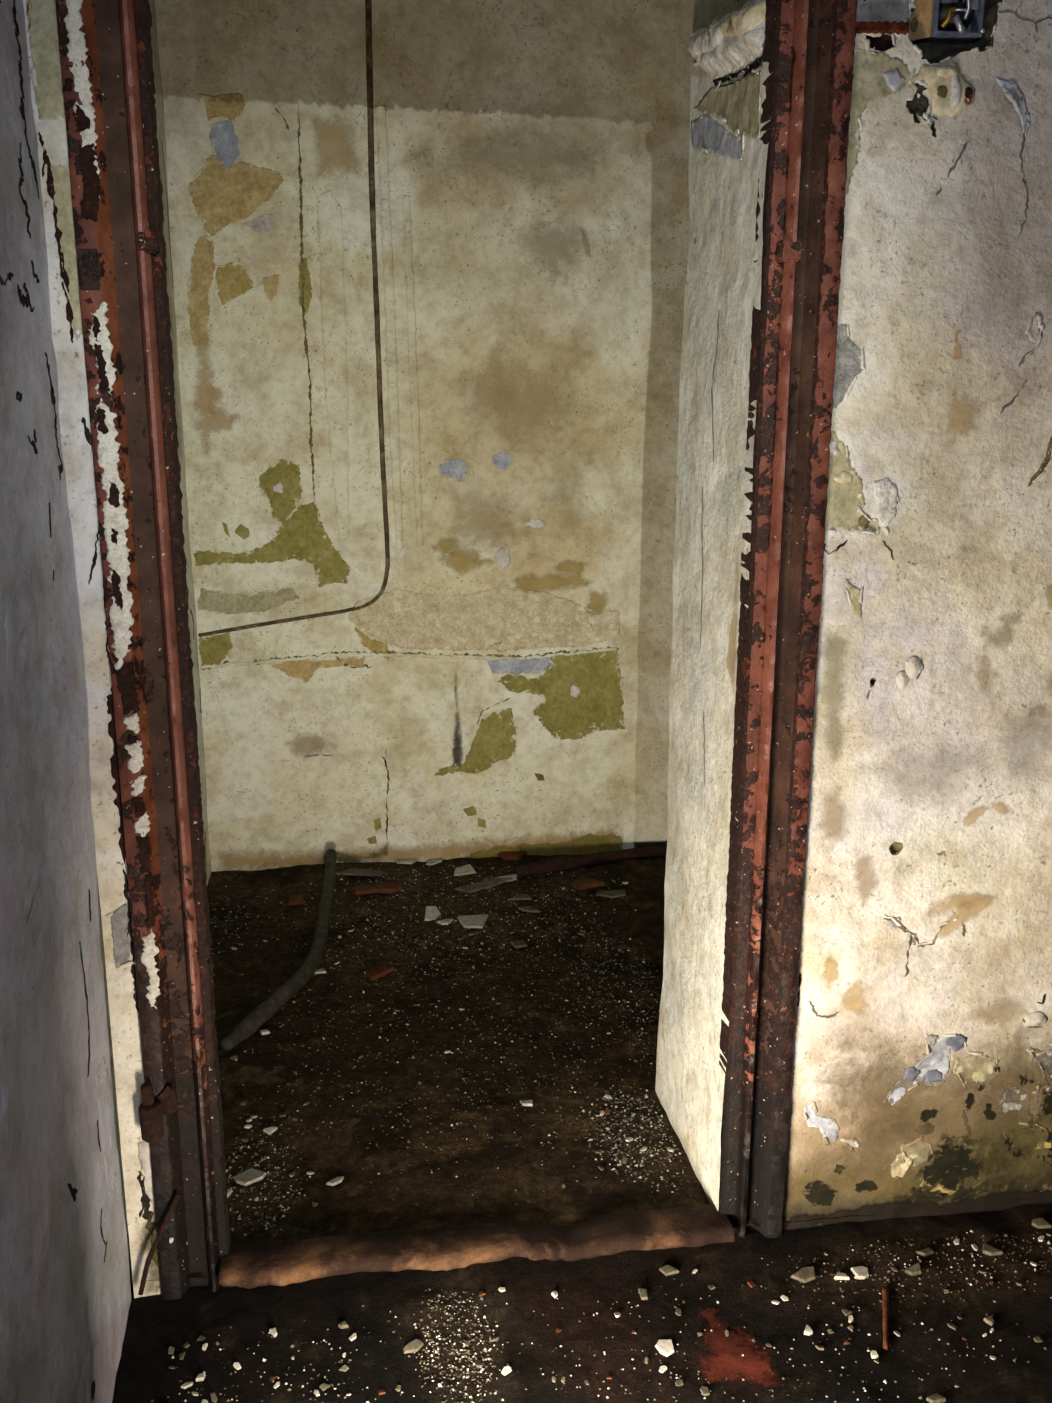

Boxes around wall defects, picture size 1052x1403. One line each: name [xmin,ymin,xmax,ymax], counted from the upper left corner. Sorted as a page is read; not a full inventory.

corrosion [62,78,102,222]
peeling [845,0,1005,196]
crack [909,109,970,196]
crack [1018,127,1029,237]
crack [0,0,92,581]
corrosion [92,316,110,434]
corrosion [110,569,123,610]
peeling [191,459,350,588]
water stain [433,539,489,572]
water stain [515,561,605,615]
spalling [271,546,626,776]
water stain [783,1048,1052,1231]